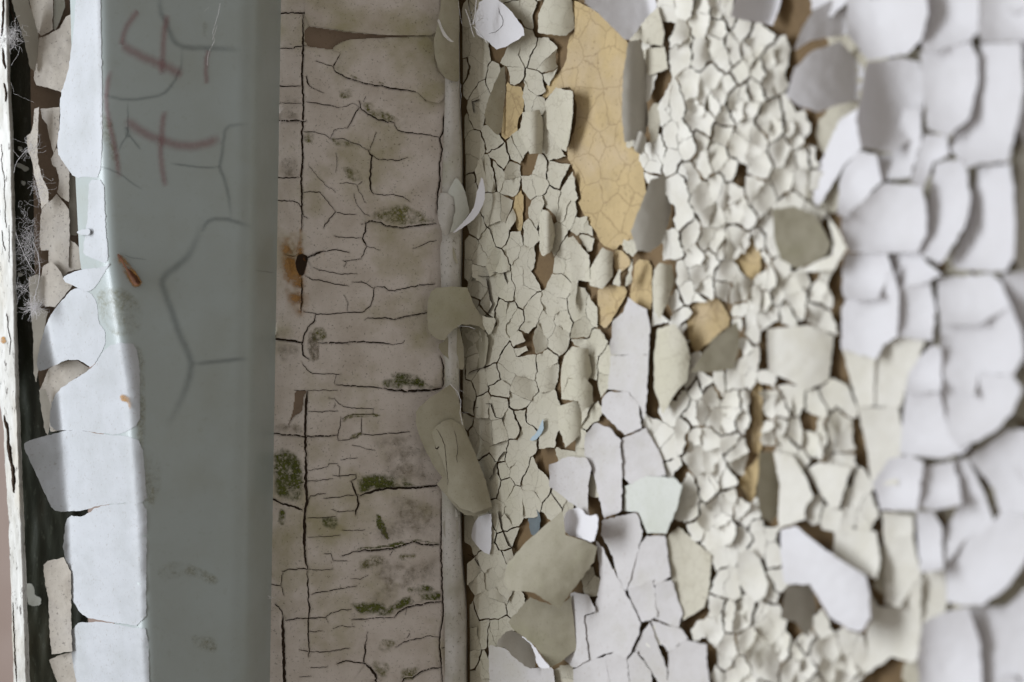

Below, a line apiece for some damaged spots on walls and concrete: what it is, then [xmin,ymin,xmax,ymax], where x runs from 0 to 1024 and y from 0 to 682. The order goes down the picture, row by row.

peeling [12,0,149,682]
corrosion [283,244,306,303]
crack [271,0,611,682]
peeling [471,514,492,554]
peeling [475,0,524,49]
peeling [488,0,740,682]
peeling [730,0,1024,682]